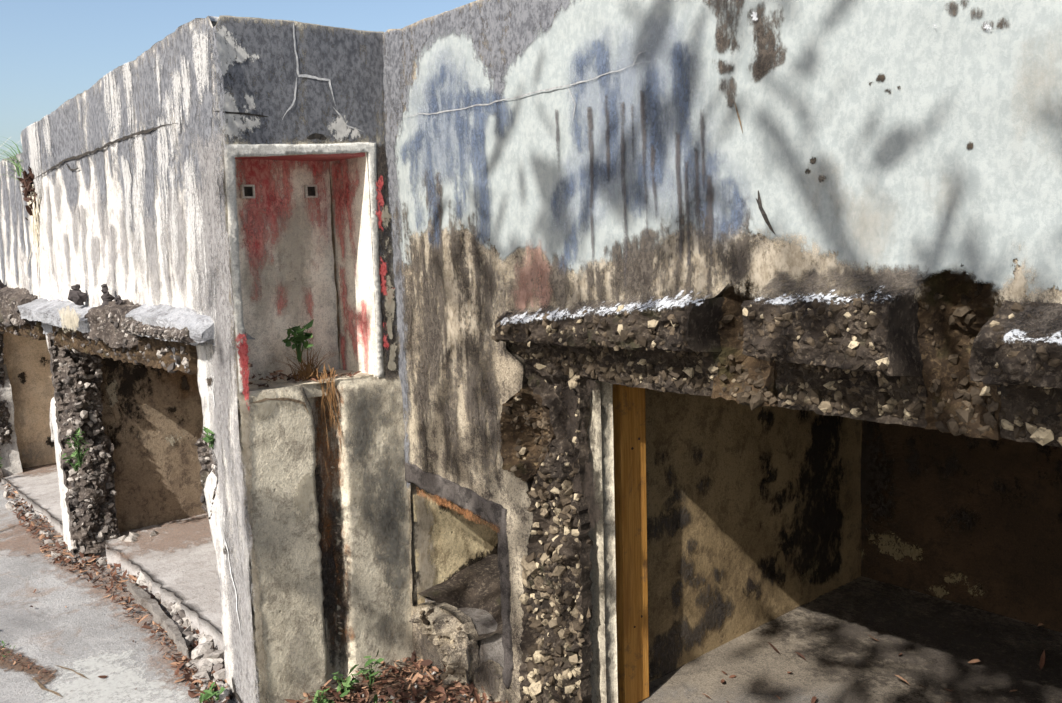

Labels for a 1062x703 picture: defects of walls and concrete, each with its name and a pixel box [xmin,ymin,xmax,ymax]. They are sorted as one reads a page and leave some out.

crack [215,24,363,132]
crack [403,51,650,120]
peeling [703,0,786,108]
leakage [0,0,575,703]
corrosion [312,386,354,654]
spalling [414,491,462,649]
leakage [558,378,603,530]
leakage [647,451,711,542]
leakage [649,538,734,680]
spalling [491,264,1062,703]
leakage [743,407,1062,703]